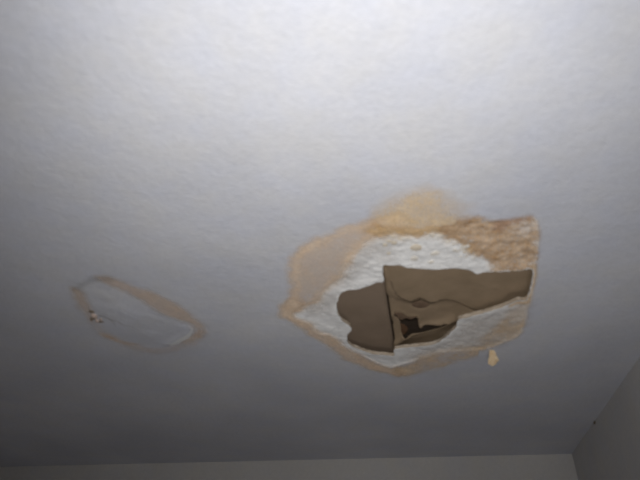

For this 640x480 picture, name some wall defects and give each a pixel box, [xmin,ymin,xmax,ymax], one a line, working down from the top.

water stain [280,193,539,376]
flaking render [293,216,539,367]